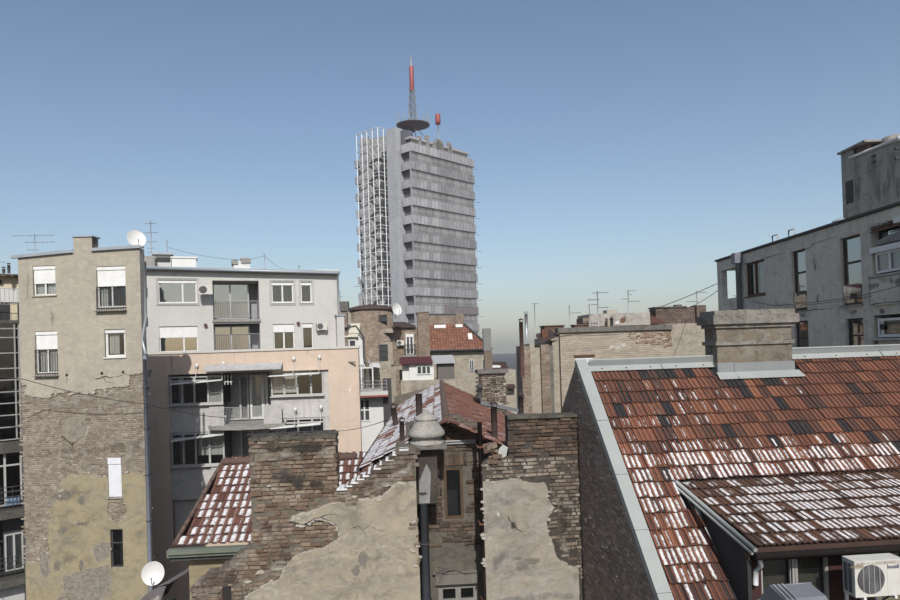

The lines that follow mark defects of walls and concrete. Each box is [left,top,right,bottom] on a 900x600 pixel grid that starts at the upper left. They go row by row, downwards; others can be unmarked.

flaking render [56,541,112,600]
flaking render [18,374,151,580]
flaking render [195,454,415,600]
flaking render [480,441,583,579]